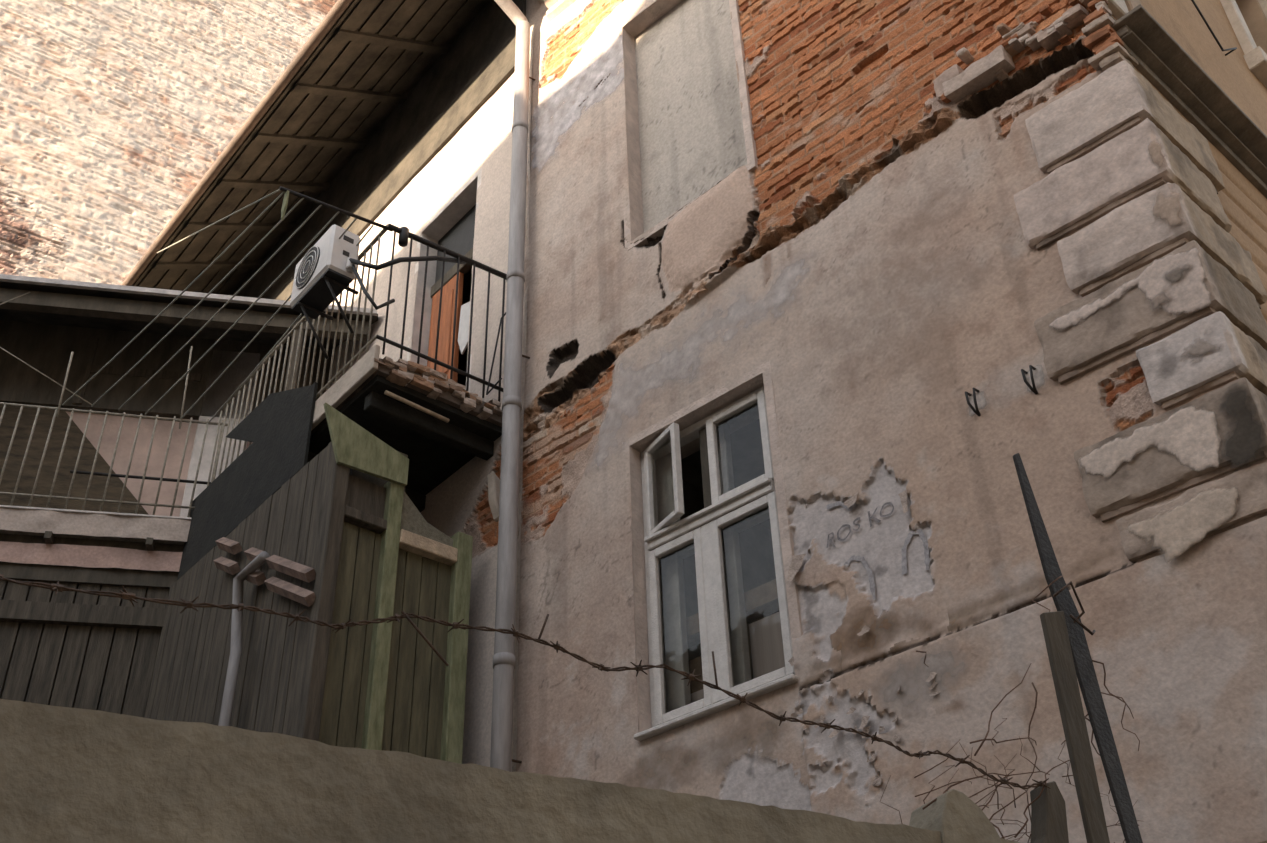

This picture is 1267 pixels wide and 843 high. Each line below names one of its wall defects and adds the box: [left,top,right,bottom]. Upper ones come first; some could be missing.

flaking render [538,0,624,89]
flaking render [732,0,1097,246]
crack [621,204,687,298]
peeling [1049,248,1210,329]
flaking render [520,339,617,545]
peeling [1080,359,1219,477]
flaking render [462,450,501,558]
peeling [718,459,935,811]